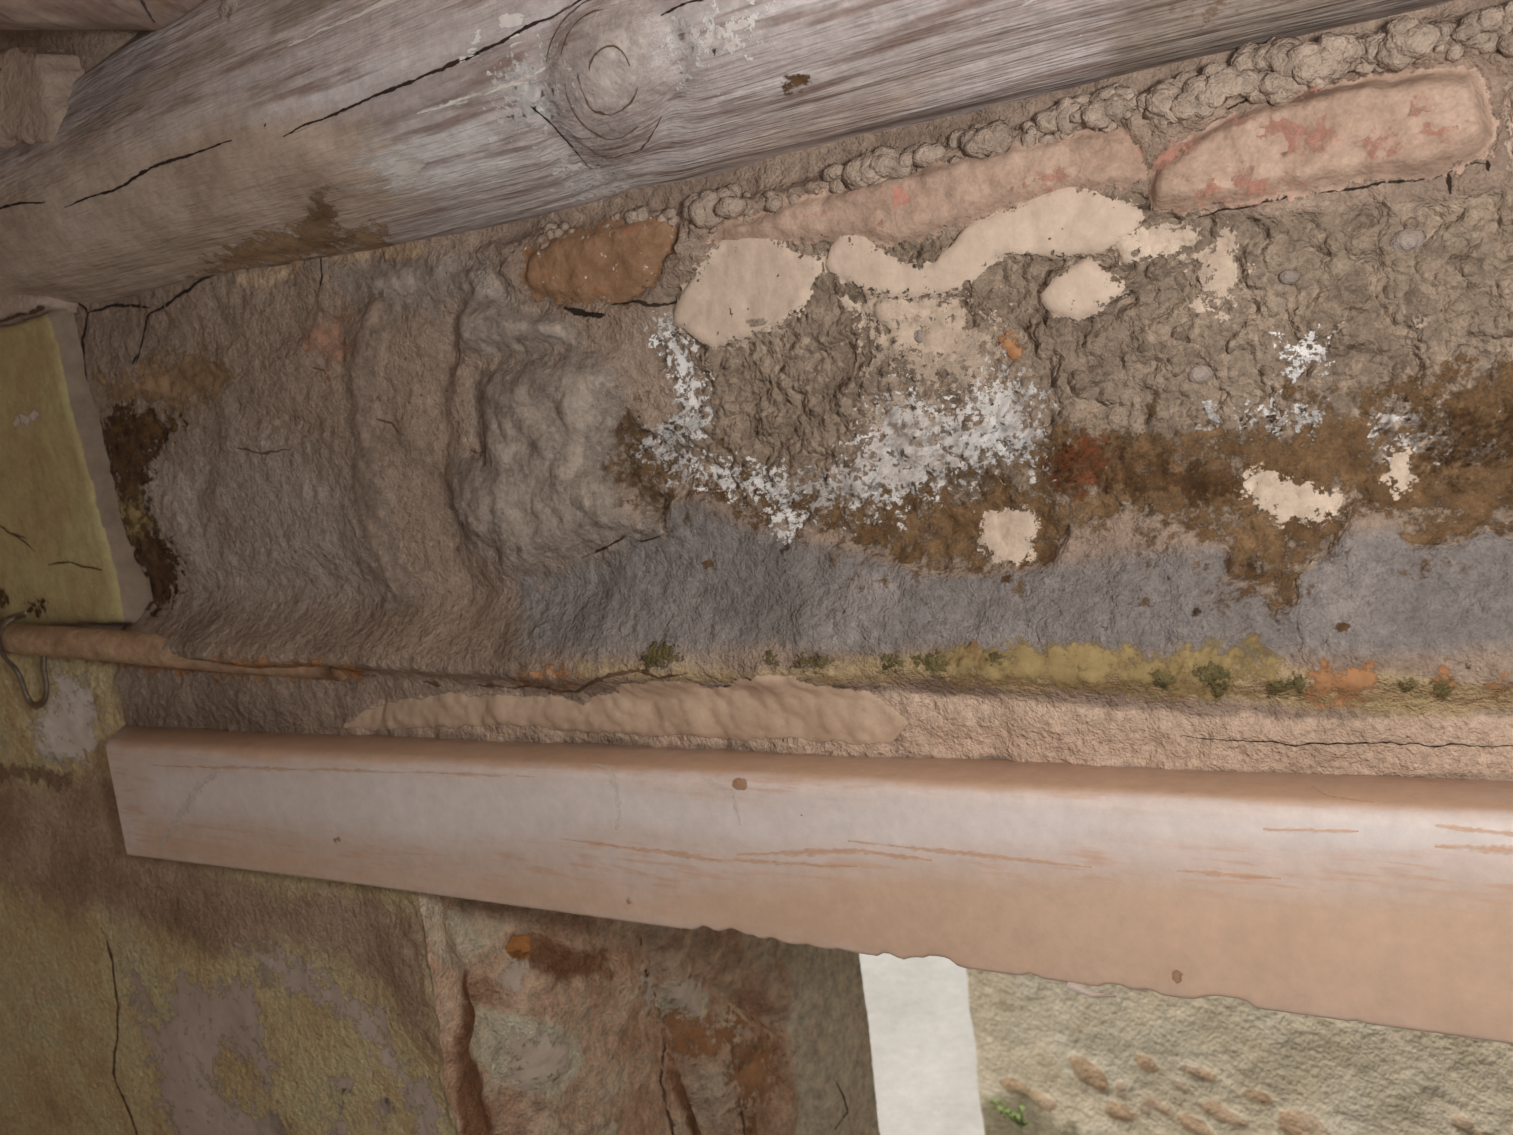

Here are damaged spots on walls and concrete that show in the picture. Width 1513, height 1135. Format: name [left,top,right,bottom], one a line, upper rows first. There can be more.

flaking render [1111,219,1256,322]
peeling [836,292,952,332]
water stain [600,277,1513,631]
water stain [638,639,686,671]
water stain [760,650,836,677]
water stain [881,633,1307,709]
water stain [1397,677,1455,701]
crack [100,927,138,1135]